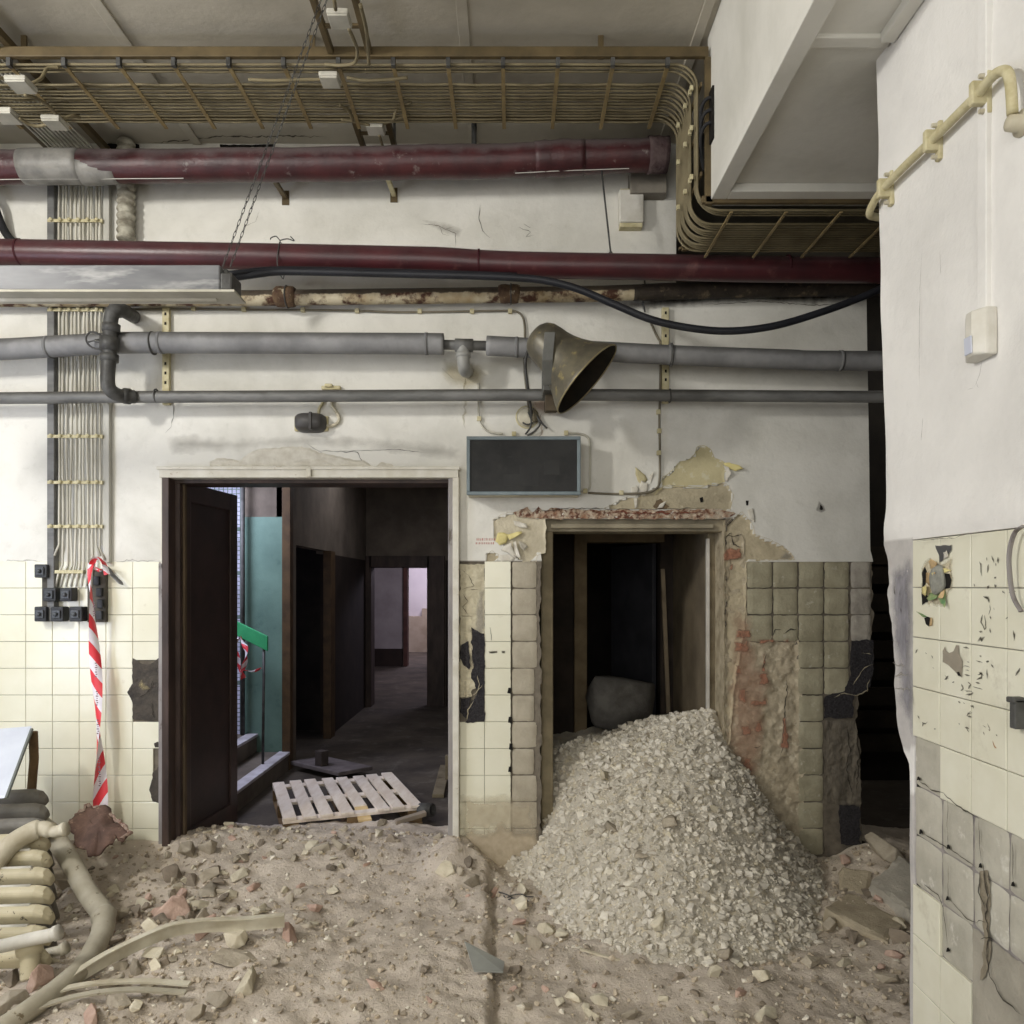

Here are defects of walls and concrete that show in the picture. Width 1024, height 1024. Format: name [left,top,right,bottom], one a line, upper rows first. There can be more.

spalling [917,545,952,626]
peeling [127,658,159,721]
peeling [459,445,871,856]
peeling [943,645,963,677]
crack [922,783,1017,1012]